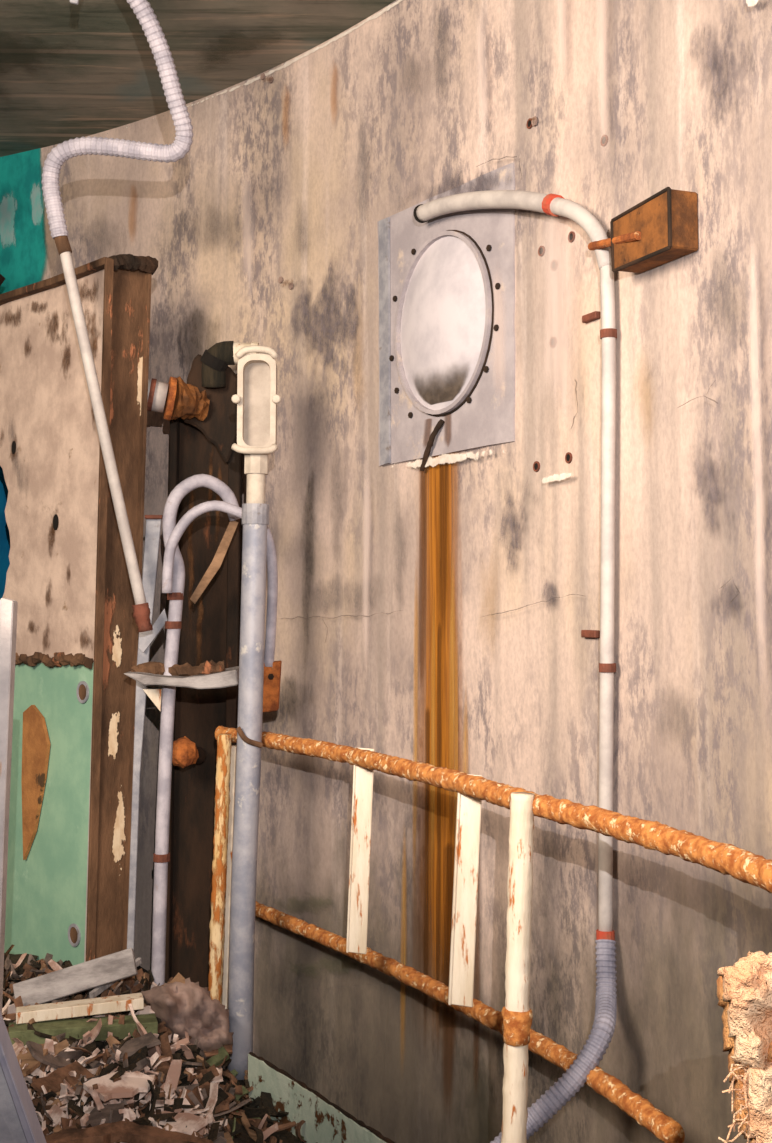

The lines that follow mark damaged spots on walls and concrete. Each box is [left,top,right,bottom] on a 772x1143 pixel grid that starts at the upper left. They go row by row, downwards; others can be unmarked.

peeling [0,148,46,294]
damp [295,266,358,362]
peeling [0,466,10,600]
damp [501,497,523,565]
damp [697,443,729,527]
rust [422,453,460,771]
crack [483,594,583,617]
rust [422,784,457,987]